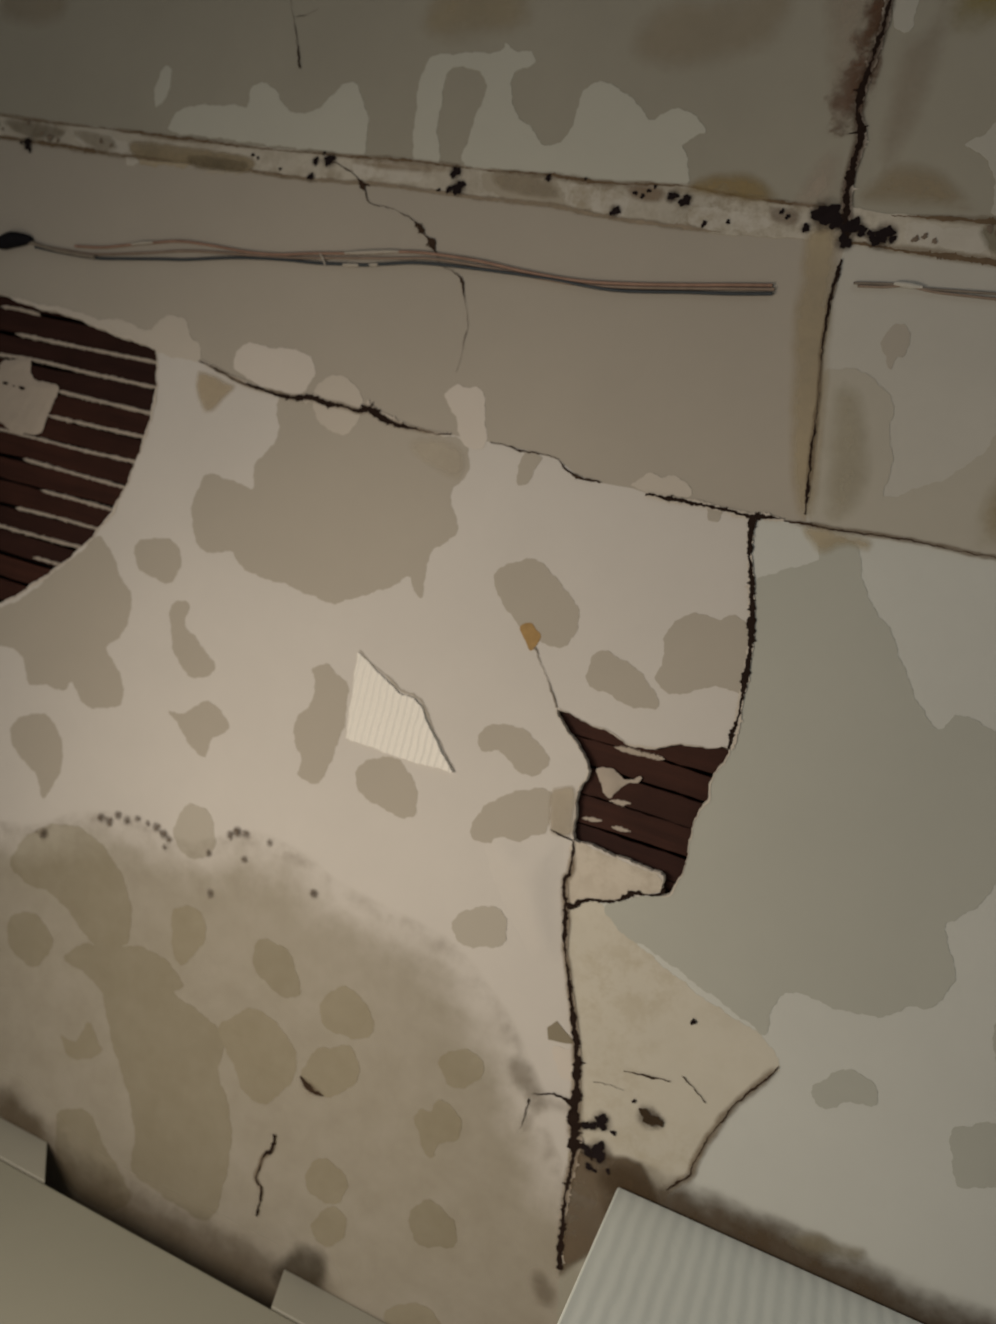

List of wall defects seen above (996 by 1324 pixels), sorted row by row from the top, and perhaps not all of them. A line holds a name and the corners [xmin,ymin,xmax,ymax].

crack [332,162,469,371]
crack [199,360,451,436]
crack [645,0,996,750]
peeling [880,324,911,369]
spalling [0,293,158,709]
crack [490,442,601,483]
peeling [556,368,996,1191]
crack [520,829,779,1270]
crack [254,1134,277,1217]
damp [251,1288,272,1309]
damp [279,1253,320,1285]